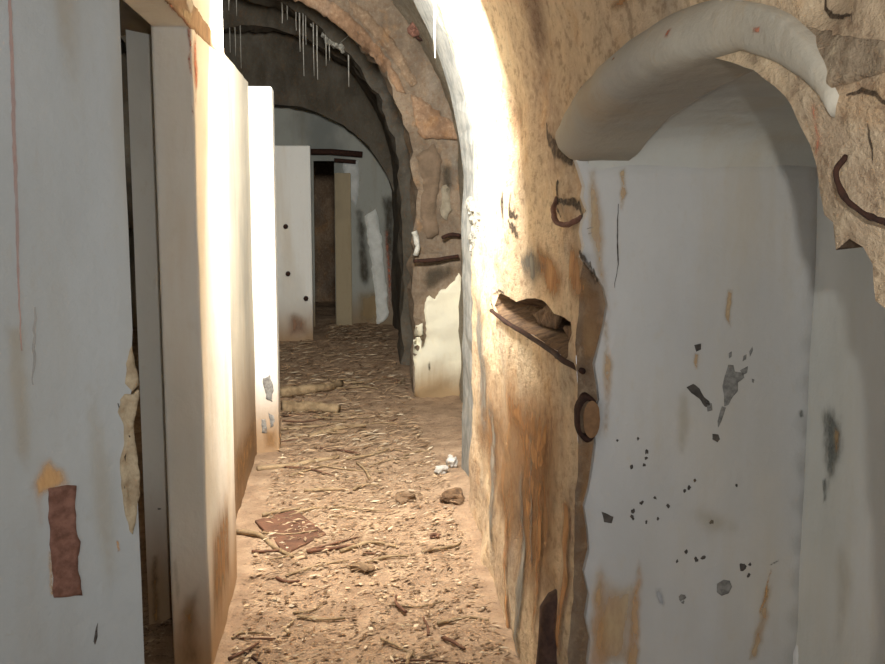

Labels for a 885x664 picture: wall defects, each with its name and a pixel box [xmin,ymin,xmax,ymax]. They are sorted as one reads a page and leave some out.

spalling [807,27,885,88]
peeling [413,273,461,398]
spalling [489,294,586,375]
corrosion [37,464,63,493]
spalling [118,346,140,534]
damp [476,312,496,542]
peeling [687,348,754,442]
peeling [717,580,732,596]